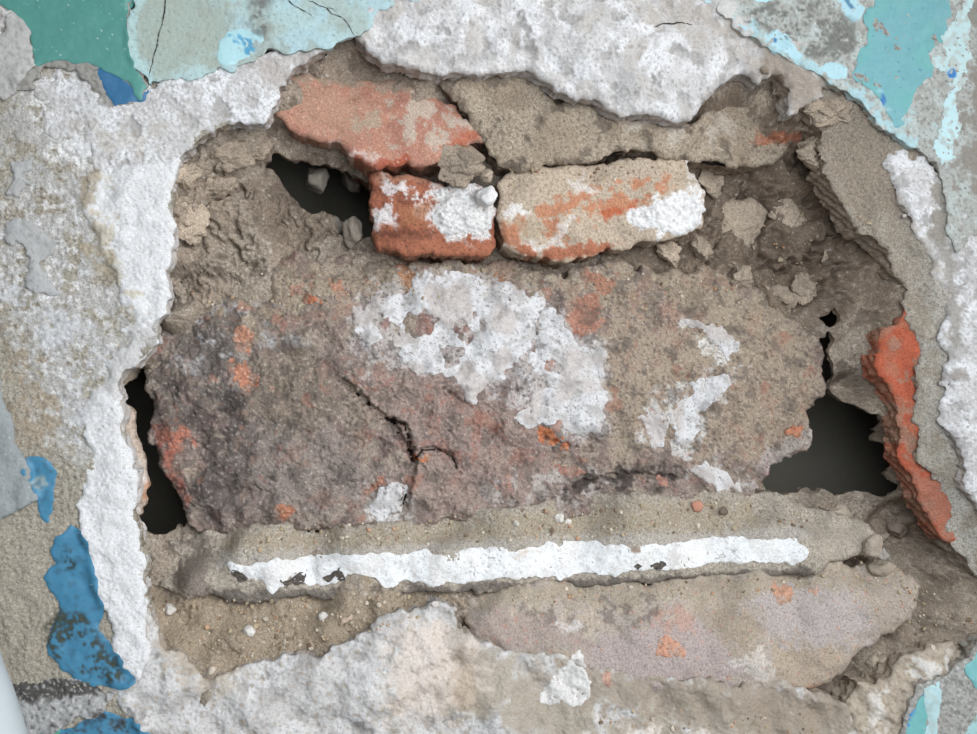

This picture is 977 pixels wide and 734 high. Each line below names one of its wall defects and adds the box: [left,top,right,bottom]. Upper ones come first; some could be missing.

crack [149,0,166,75]
crack [288,0,354,35]
peeling [819,0,974,164]
spalling [0,0,905,445]
crack [349,386,459,472]
flaking render [44,149,977,734]
peeling [21,456,57,522]